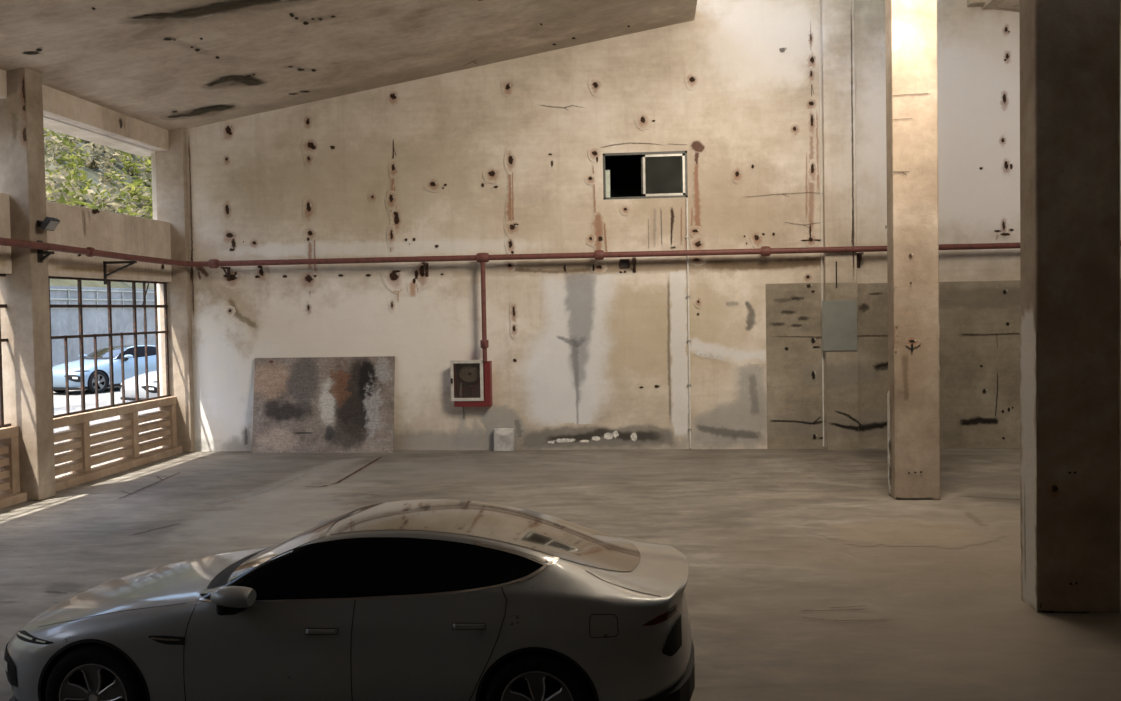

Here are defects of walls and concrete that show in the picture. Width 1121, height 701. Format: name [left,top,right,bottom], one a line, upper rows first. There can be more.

rust [505,173,515,223]
rust [681,140,706,250]
rust [805,108,820,234]
water stain [453,207,824,450]